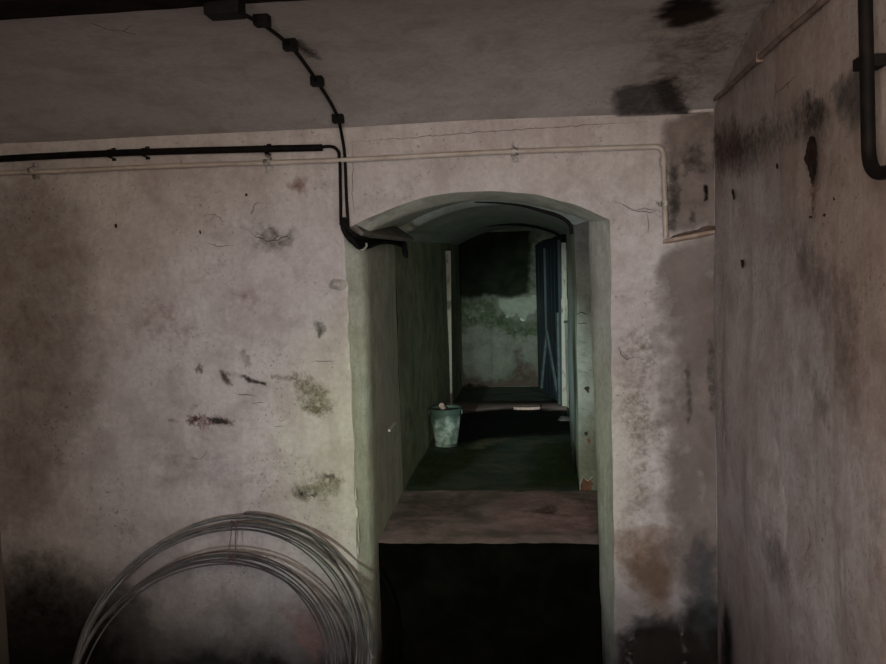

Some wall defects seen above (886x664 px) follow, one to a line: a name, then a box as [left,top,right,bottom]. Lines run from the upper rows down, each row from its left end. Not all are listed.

damp [837,72,860,127]
spalling [804,136,826,219]
damp [618,241,731,664]